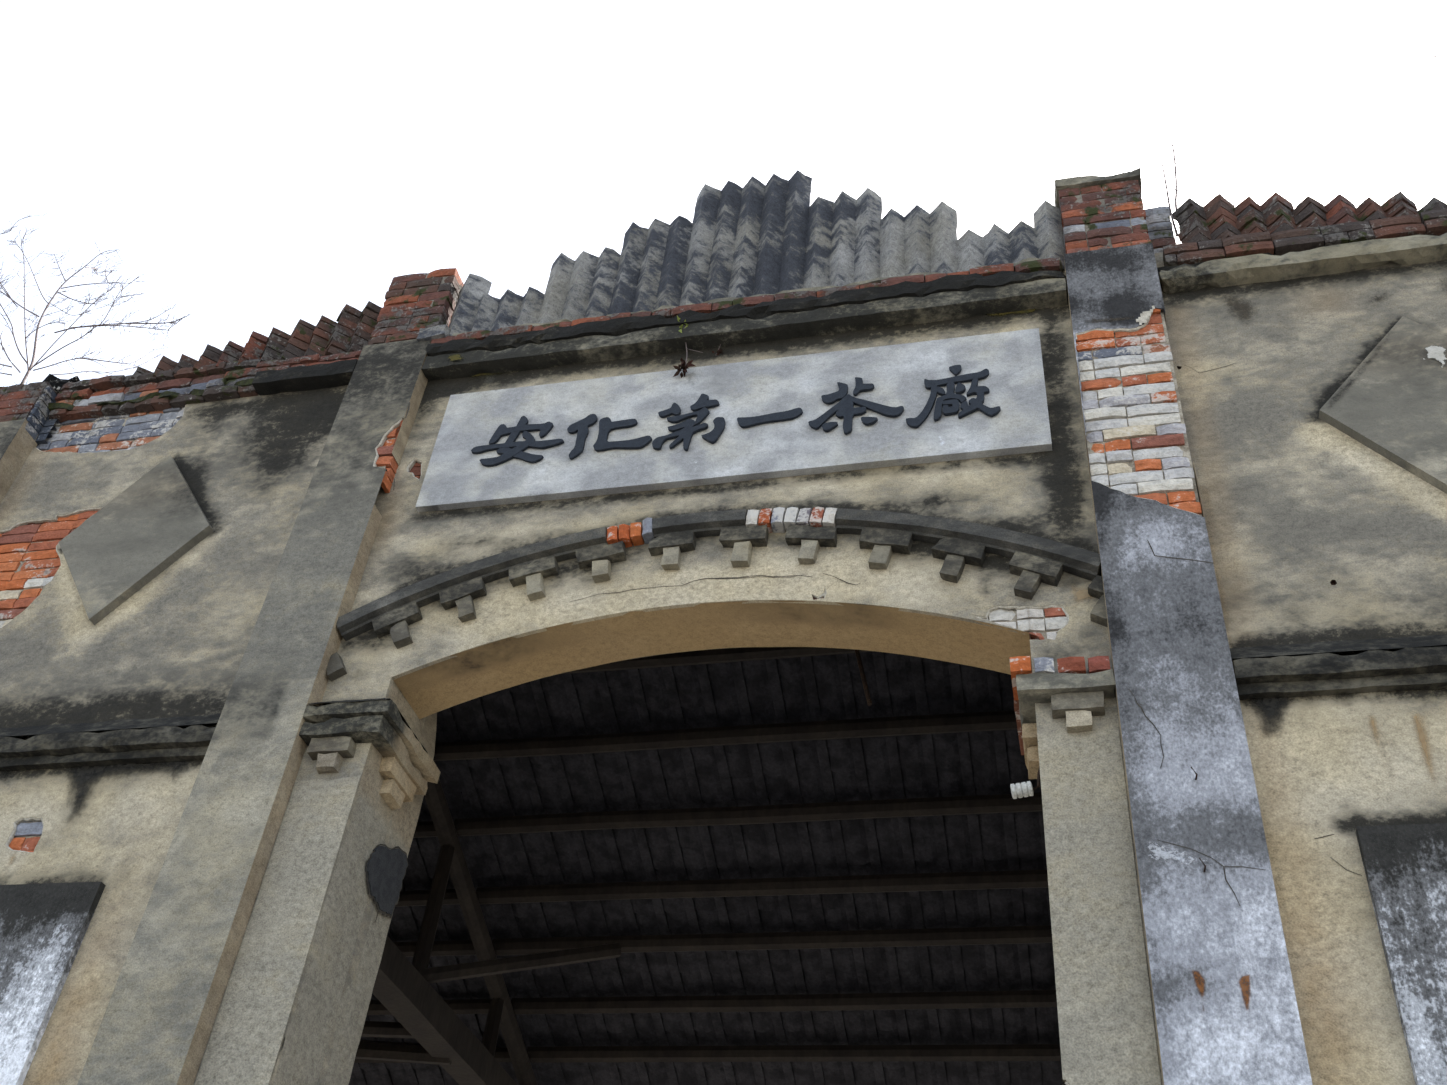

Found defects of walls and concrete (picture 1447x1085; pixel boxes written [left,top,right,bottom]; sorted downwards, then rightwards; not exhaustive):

damp [1227,298,1252,318]
spalling [36,407,185,453]
spalling [1075,306,1202,516]
spalling [373,418,422,493]
spalling [607,518,654,548]
spalling [0,507,103,628]
spalling [970,605,1069,640]
damp [1256,697,1288,732]
rust [1193,971,1205,1010]
rust [1239,975,1250,1009]